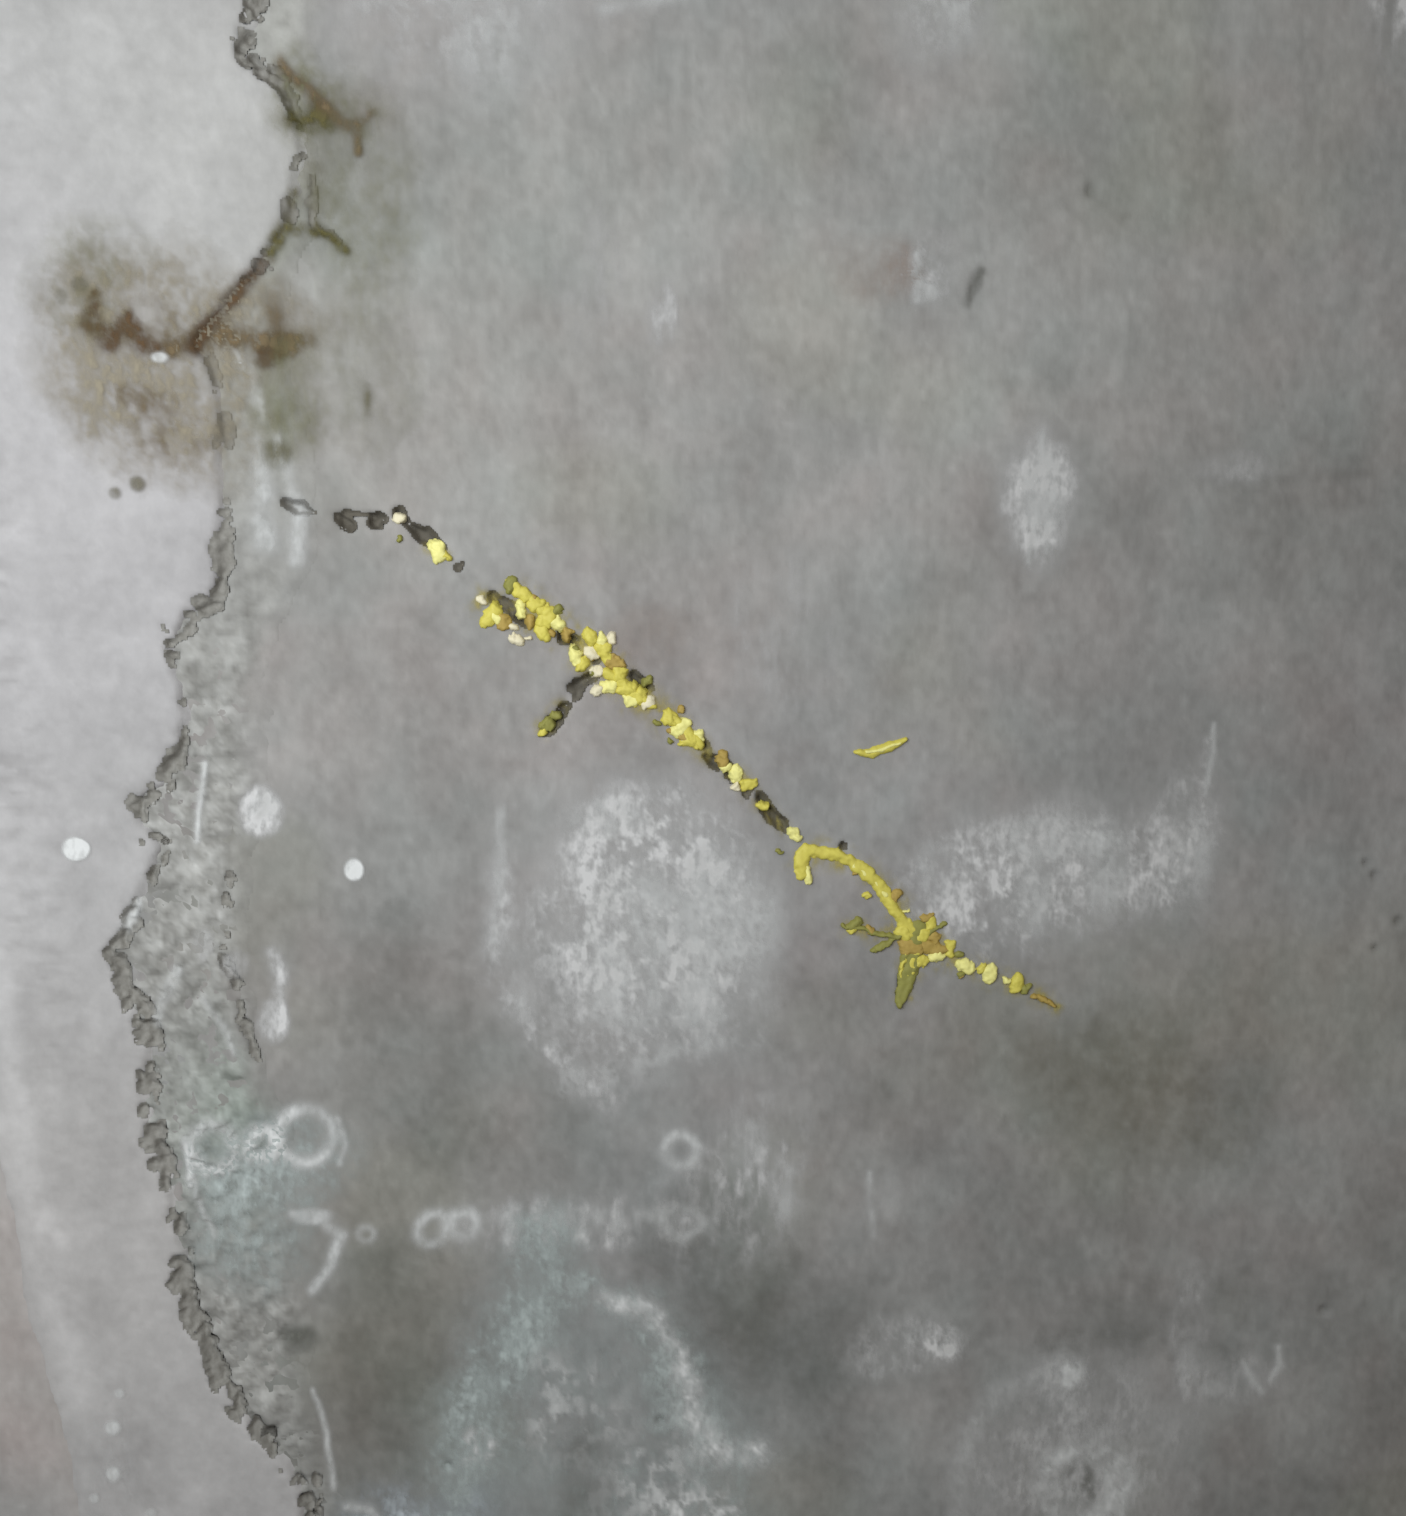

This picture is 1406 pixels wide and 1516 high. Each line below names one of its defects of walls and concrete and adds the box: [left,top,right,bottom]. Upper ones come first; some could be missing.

crack [203,351,236,450]
crack [230,0,342,280]
water stain [266,222,349,256]
crack [102,497,323,1516]
flaking render [115,0,348,1516]
crack [280,497,1060,1009]